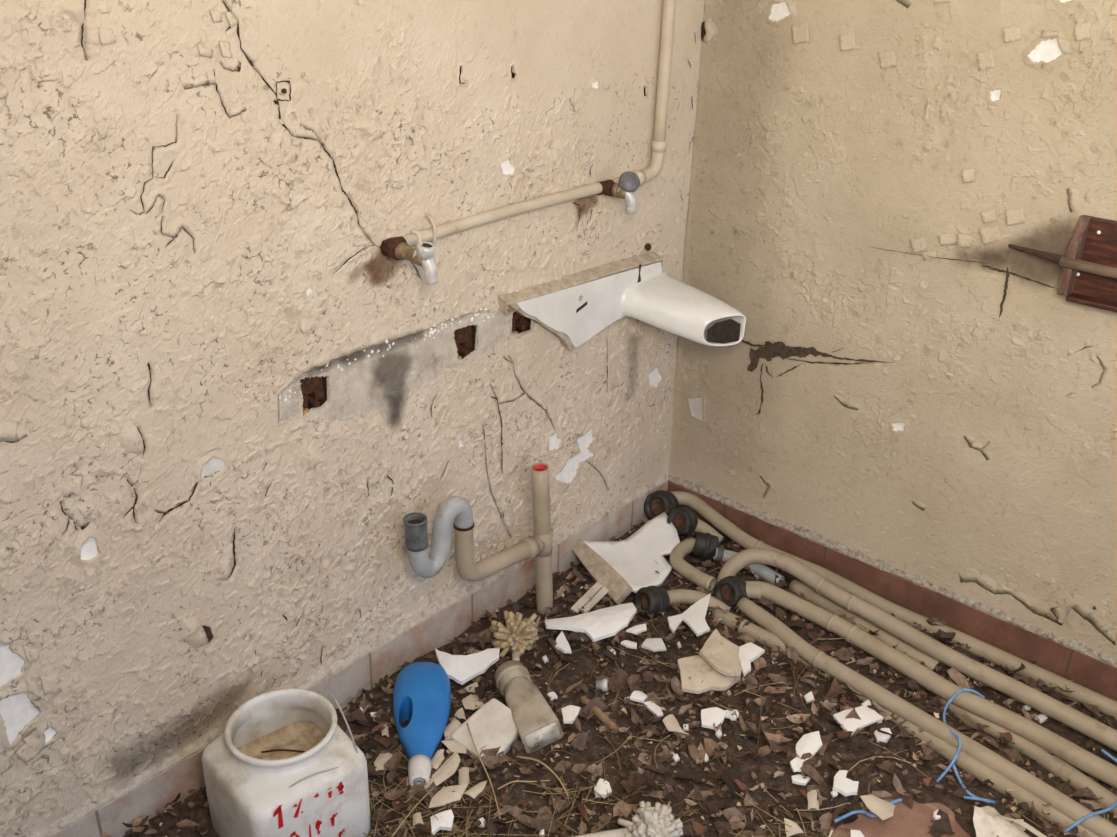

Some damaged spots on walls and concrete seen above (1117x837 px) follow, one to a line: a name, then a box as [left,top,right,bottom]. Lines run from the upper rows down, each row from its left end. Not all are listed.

crack [81,0,101,60]
peeling [976,20,1091,71]
crack [127,0,381,277]
spalling [279,303,574,425]
crack [834,394,859,410]
crack [123,358,225,531]
crack [484,352,561,538]
peeling [545,423,596,487]
crack [964,435,996,460]
crack [59,498,90,540]
crack [912,499,927,511]
peeling [0,640,63,752]